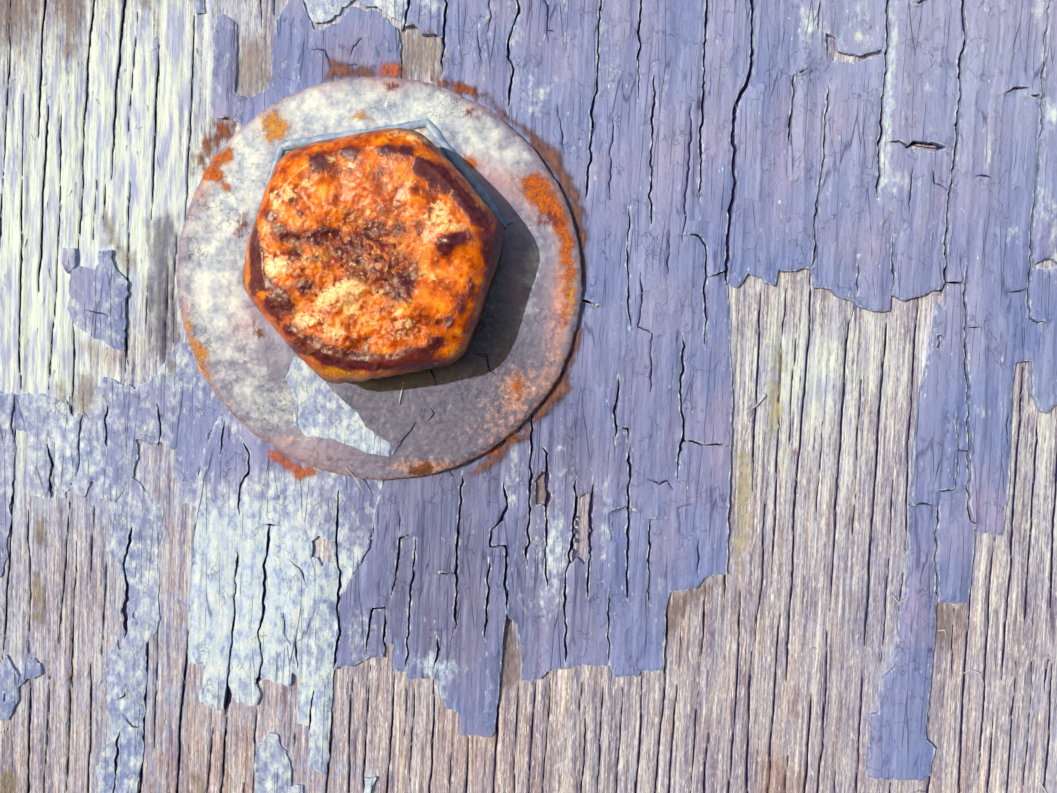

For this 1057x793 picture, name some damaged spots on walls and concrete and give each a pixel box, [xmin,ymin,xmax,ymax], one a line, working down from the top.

crack [312,38,362,67]
crack [402,0,411,31]
crack [440,0,448,74]
rust [263,111,288,141]
peeling [0,0,751,793]
crack [394,369,436,454]
crack [477,0,1057,793]
peeling [727,0,1057,781]
crack [294,470,469,793]